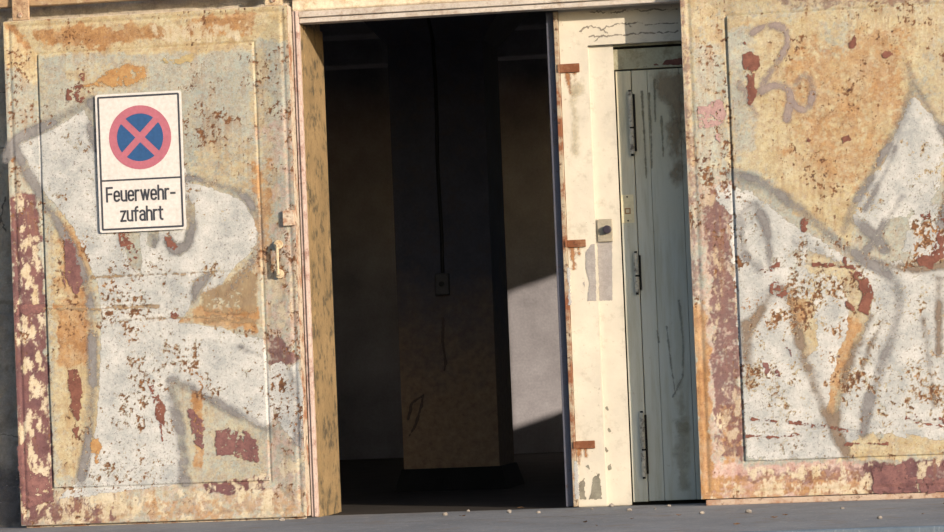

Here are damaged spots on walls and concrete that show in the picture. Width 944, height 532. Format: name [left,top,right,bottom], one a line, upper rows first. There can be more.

crack [579,8,678,41]
water stain [641,79,664,175]
peeling [14,303,46,317]
peeling [62,239,83,296]
corrosion [42,267,257,324]
corrosion [553,11,587,507]
corrosion [812,257,874,315]
corrosion [917,212,944,271]
peeling [68,369,83,438]
corrosion [148,385,167,442]
peeling [17,440,54,508]
peeling [871,463,944,494]